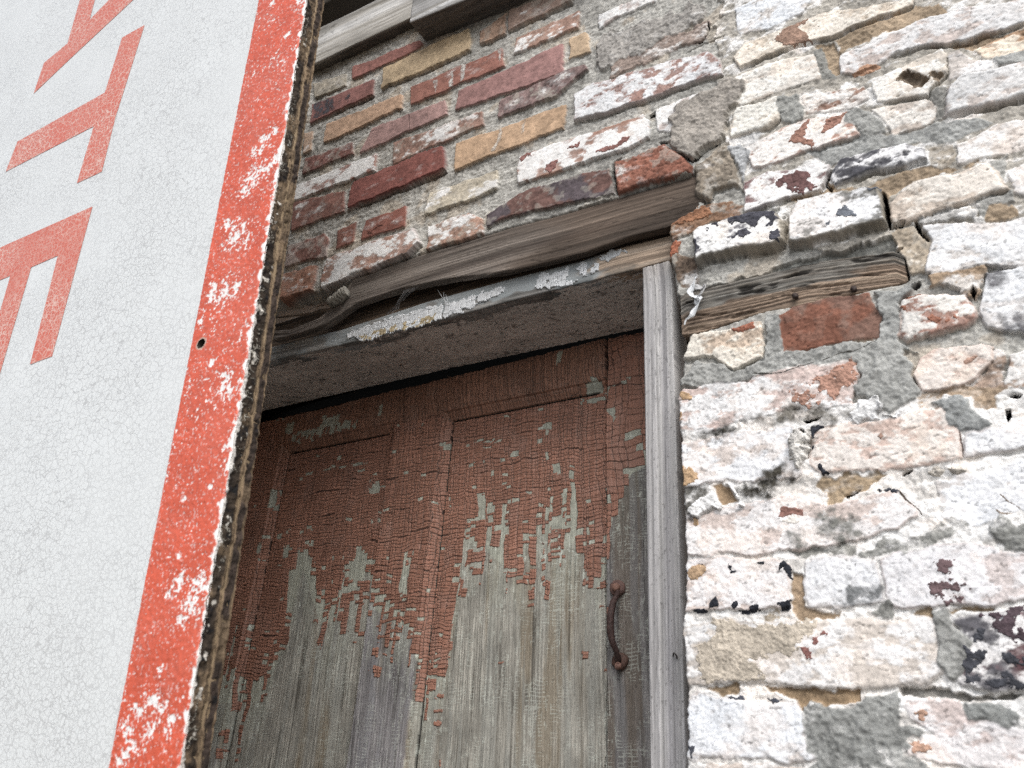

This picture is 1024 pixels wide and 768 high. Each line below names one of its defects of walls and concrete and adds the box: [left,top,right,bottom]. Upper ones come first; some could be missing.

peeling [596,136,630,152]
crack [882,196,929,278]
peeling [534,249,628,290]
peeling [346,286,505,342]
peeling [214,332,646,762]